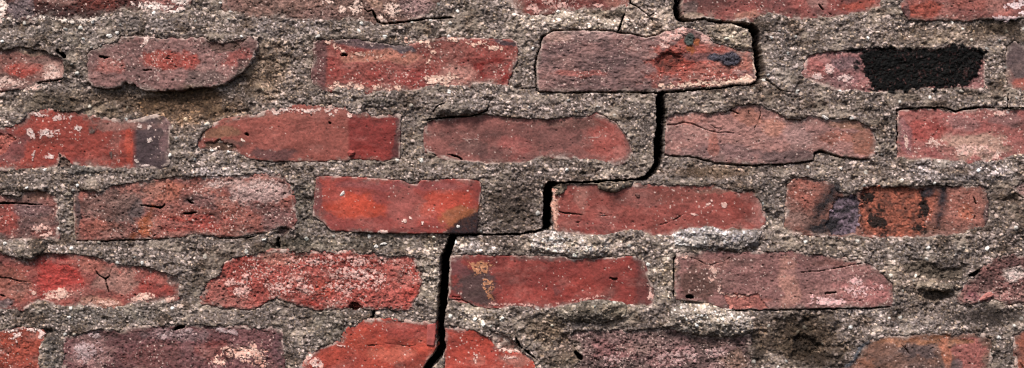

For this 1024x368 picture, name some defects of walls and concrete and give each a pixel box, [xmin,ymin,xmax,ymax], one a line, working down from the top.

crack [618,0,681,36]
crack [426,103,488,121]
crack [533,25,780,232]
crack [425,234,475,368]